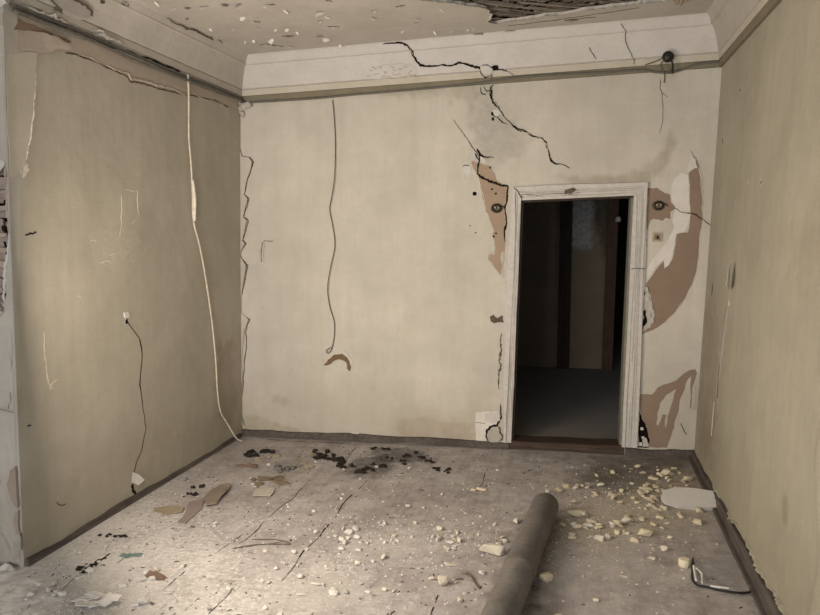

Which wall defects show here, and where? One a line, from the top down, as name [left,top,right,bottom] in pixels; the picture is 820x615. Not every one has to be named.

peeling [244,29,299,49]
crack [384,42,569,168]
crack [454,121,545,199]
spalling [0,160,10,305]
peeling [462,161,509,278]
peeling [642,151,703,334]
peeling [637,369,700,448]